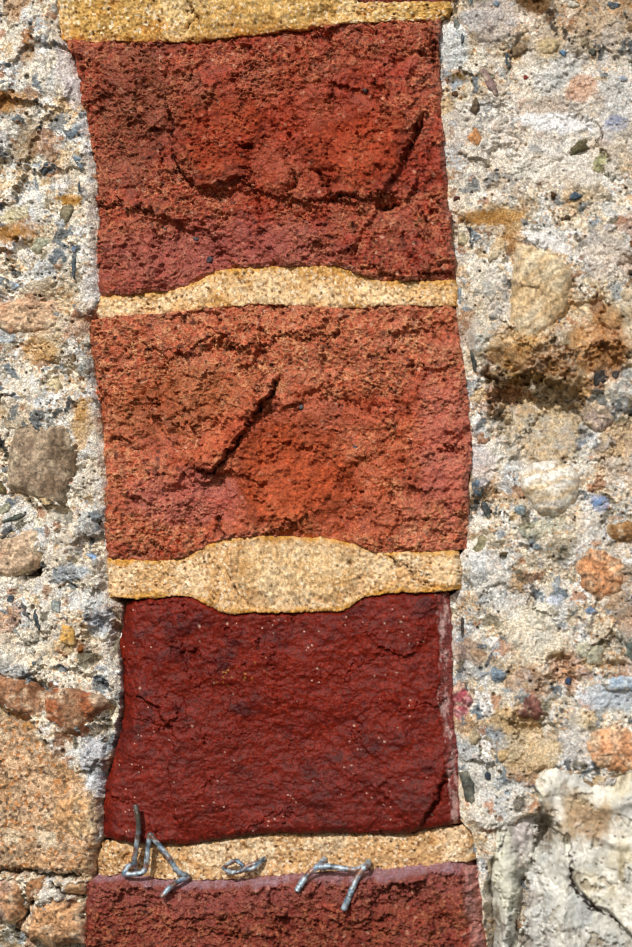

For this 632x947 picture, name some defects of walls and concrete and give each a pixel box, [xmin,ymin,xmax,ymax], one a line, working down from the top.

crack [197,383,276,475]
crack [568,846,632,936]